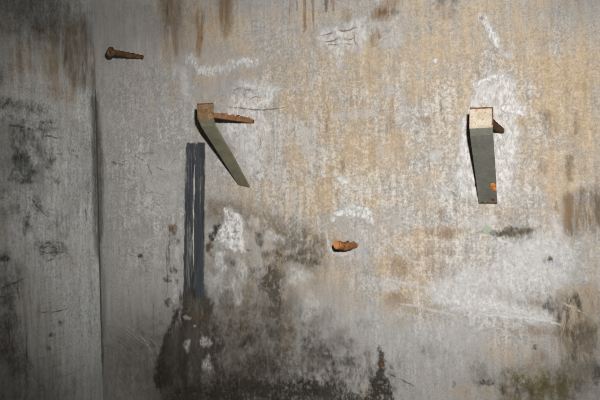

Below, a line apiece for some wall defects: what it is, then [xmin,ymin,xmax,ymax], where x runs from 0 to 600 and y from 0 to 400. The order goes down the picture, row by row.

water stain [154,262,393,400]